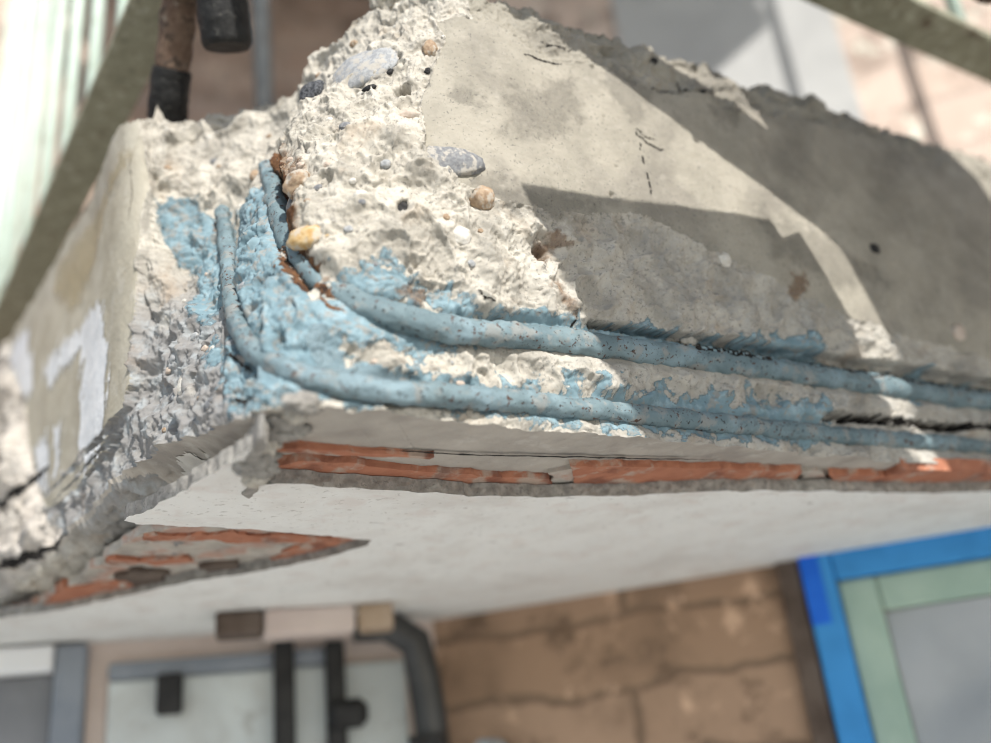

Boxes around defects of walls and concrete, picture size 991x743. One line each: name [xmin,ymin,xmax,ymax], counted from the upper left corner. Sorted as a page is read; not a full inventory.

corrosion [269,153,294,234]
corrosion [273,248,309,292]
corrosion [299,250,321,273]
spalling [182,0,991,483]
peeling [0,106,991,648]
crack [680,343,991,393]
crack [822,413,991,433]
crack [0,465,49,509]
crack [0,533,67,570]